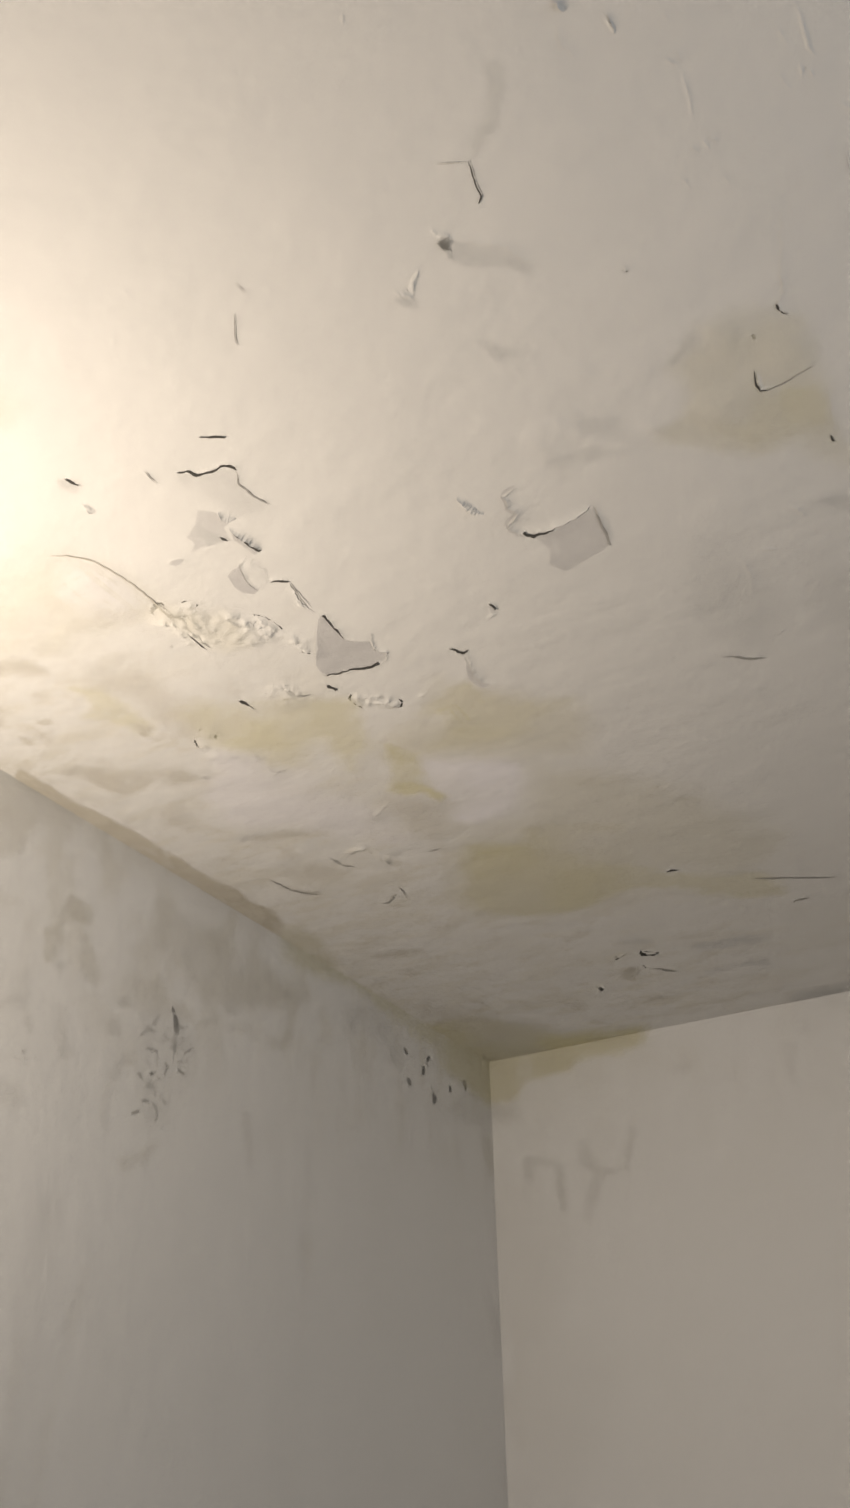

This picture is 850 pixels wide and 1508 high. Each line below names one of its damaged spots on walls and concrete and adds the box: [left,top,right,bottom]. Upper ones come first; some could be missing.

spalling [427,225,535,262]
crack [145,427,272,504]
peeling [500,487,619,571]
peeling [145,509,407,713]
leakage [389,748,524,823]
leakage [461,829,625,914]
leakage [138,1007,190,1079]
leakage [433,1001,639,1062]